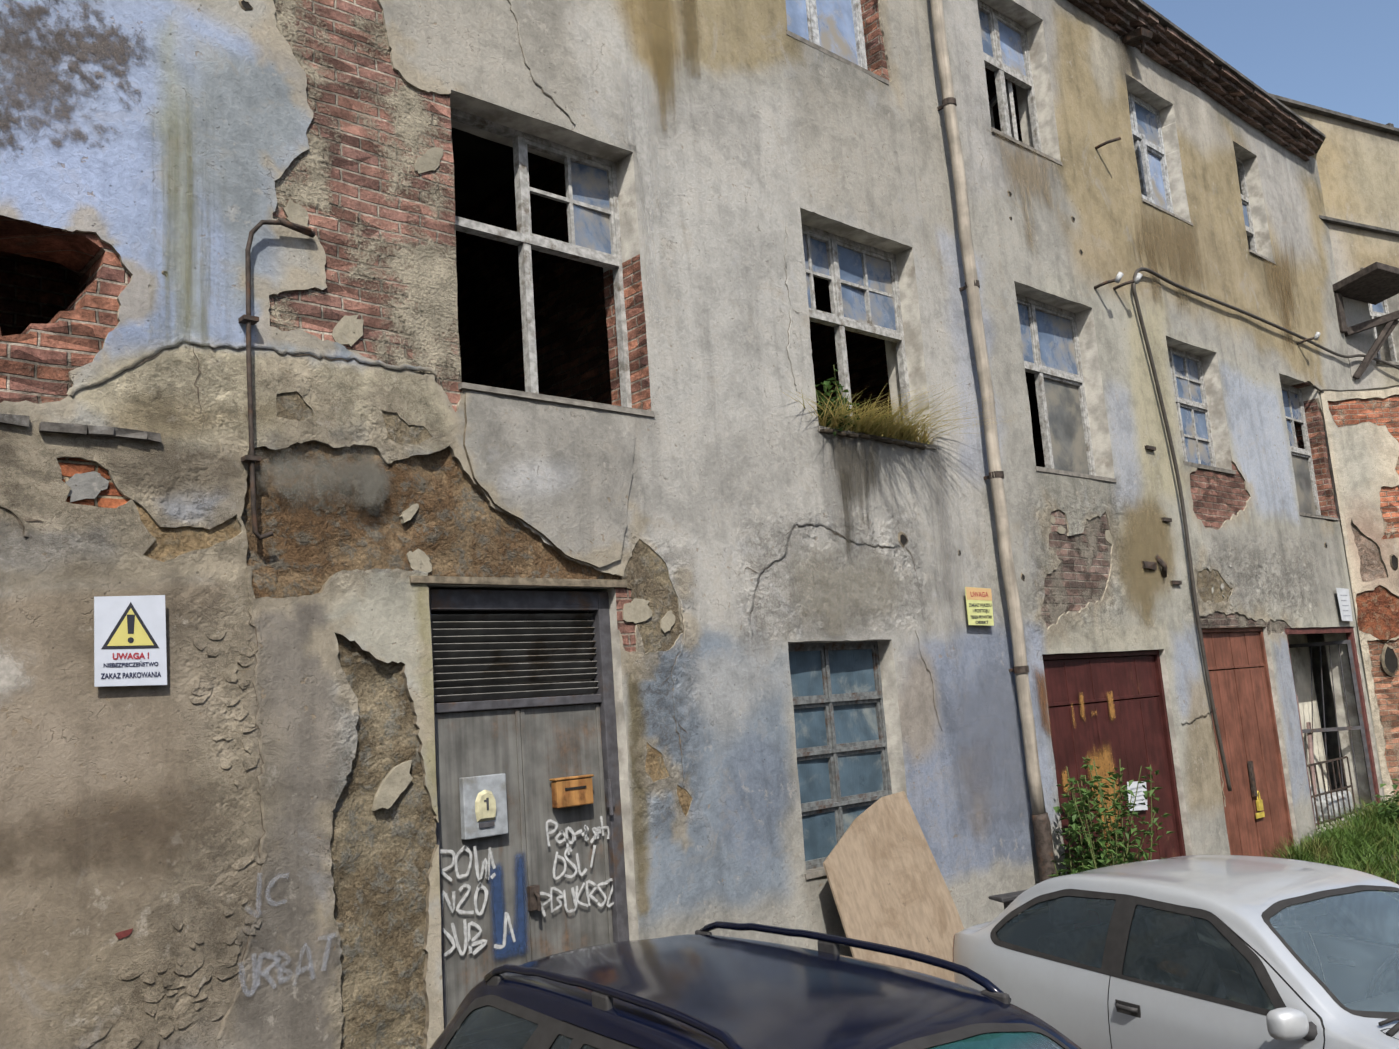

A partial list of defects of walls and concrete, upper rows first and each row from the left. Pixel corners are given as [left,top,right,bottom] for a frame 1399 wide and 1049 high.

peeling [0,0,144,150]
crack [508,0,576,125]
flaking render [0,220,133,404]
flaking render [268,0,464,413]
crack [784,222,798,390]
flaking render [57,410,684,654]
crack [739,521,943,731]
flaking render [1041,509,1113,630]
flaking render [1190,461,1251,530]
flaking render [1304,381,1399,805]
crack [217,566,270,1040]
flaking render [330,633,439,1049]